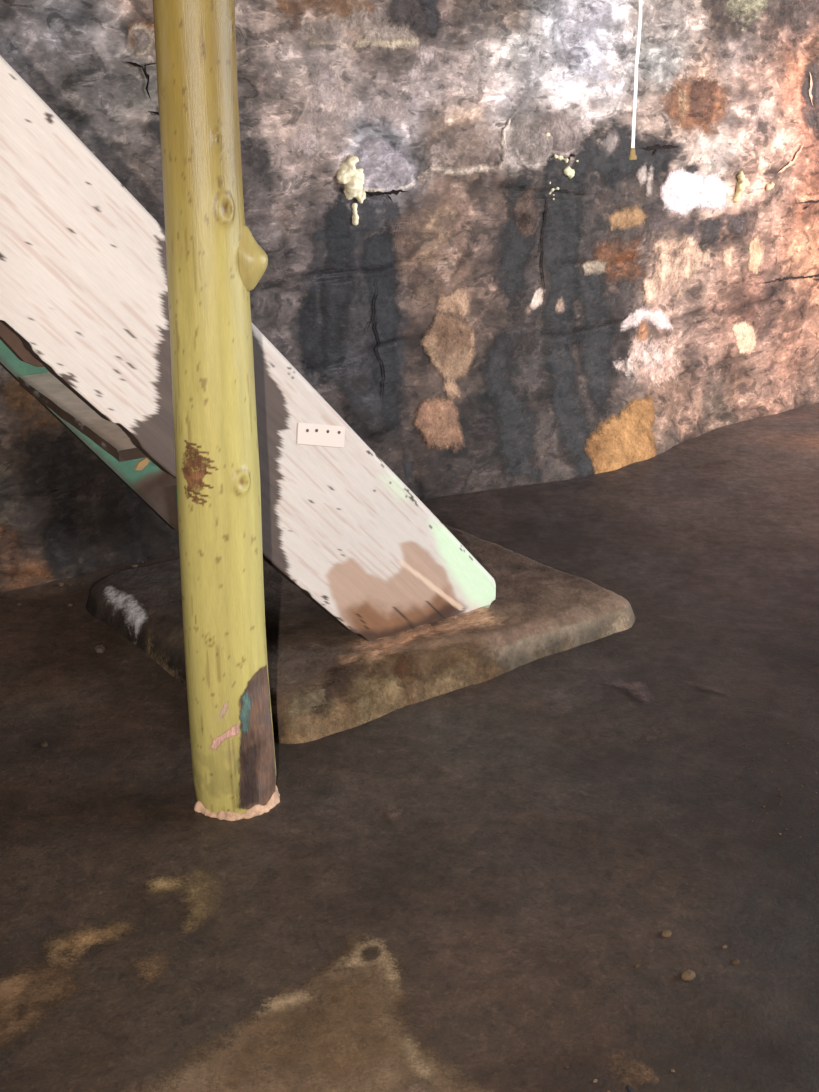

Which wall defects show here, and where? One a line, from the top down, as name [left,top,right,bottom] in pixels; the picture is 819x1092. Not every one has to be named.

crack [125,61,159,115]
water stain [294,186,408,438]
water stain [482,120,764,486]
crack [758,275,819,284]
spalling [239,642,508,809]